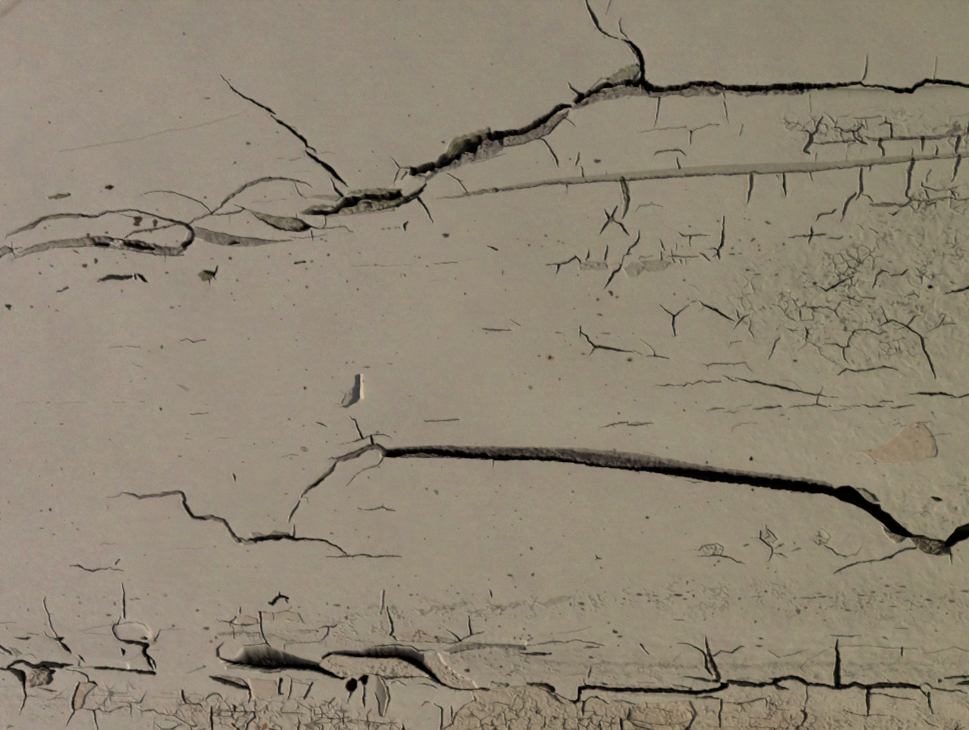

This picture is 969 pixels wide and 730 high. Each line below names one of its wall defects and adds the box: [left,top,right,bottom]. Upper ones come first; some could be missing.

crack [0,0,969,290]
peeling [335,374,363,408]
crack [481,319,521,332]
crack [578,300,720,360]
crack [653,266,969,433]
peeling [852,421,952,465]
crack [105,415,969,576]
crack [67,558,126,620]
crack [0,595,454,730]
crack [379,589,485,645]
peeling [207,635,694,730]
crack [566,633,969,730]